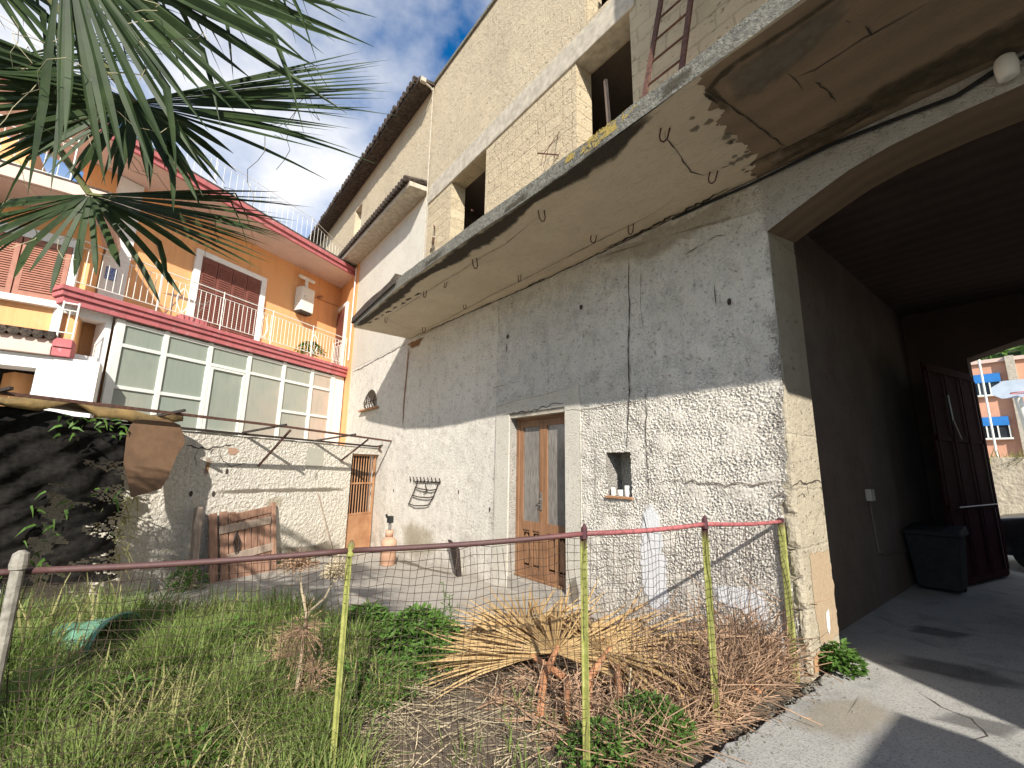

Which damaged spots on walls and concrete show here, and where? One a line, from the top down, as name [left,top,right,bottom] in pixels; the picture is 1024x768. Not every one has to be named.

crack [787,5,925,101]
water stain [357,118,648,326]
crack [352,90,820,515]